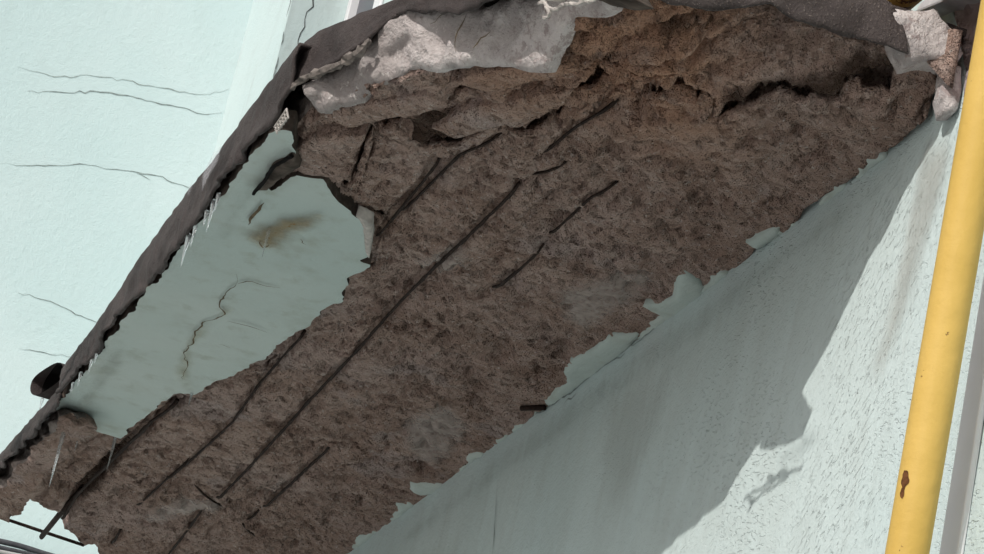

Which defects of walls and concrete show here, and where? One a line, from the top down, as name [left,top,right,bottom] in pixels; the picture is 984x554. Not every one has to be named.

crack [273,0,314,77]
spalling [927,1,981,94]
crack [8,163,189,188]
crack [20,67,225,115]
spalling [293,46,595,237]
spalling [717,82,841,137]
spalling [839,63,937,122]
crack [22,294,97,323]
crack [183,278,279,376]
spalling [216,181,521,507]
spalling [109,393,190,465]
spalling [9,431,115,540]